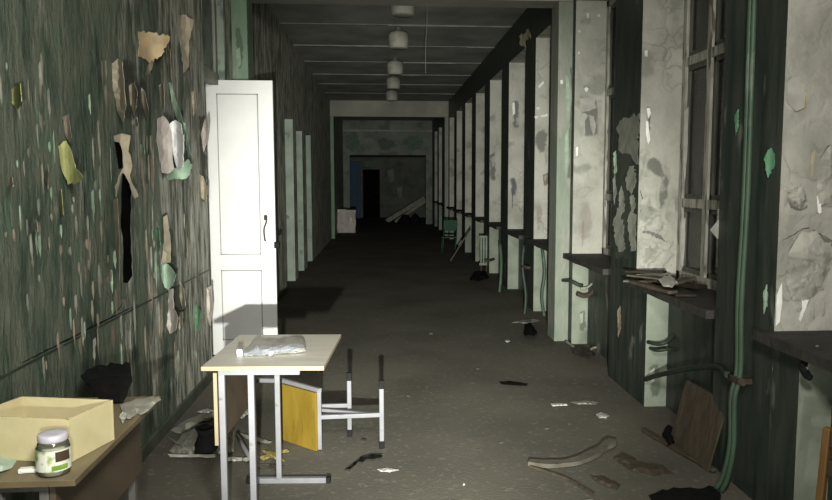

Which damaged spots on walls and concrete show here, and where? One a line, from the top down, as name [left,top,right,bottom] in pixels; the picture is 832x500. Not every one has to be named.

peeling [0,14,213,364]
peeling [560,69,602,177]
peeling [612,107,686,268]
peeling [174,343,183,389]